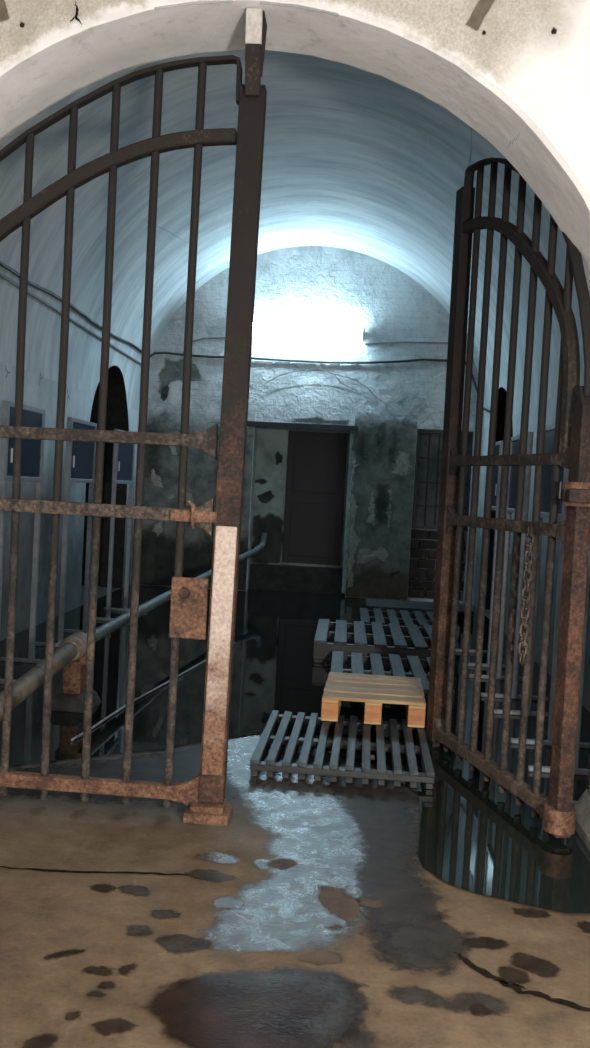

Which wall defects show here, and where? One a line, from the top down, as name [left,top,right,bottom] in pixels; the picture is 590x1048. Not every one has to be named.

crack [70,1,82,25]
spalling [158,359,201,401]
water stain [345,416,417,600]
crack [0,866,188,876]
water stain [388,986,509,1015]
crack [453,952,590,1012]